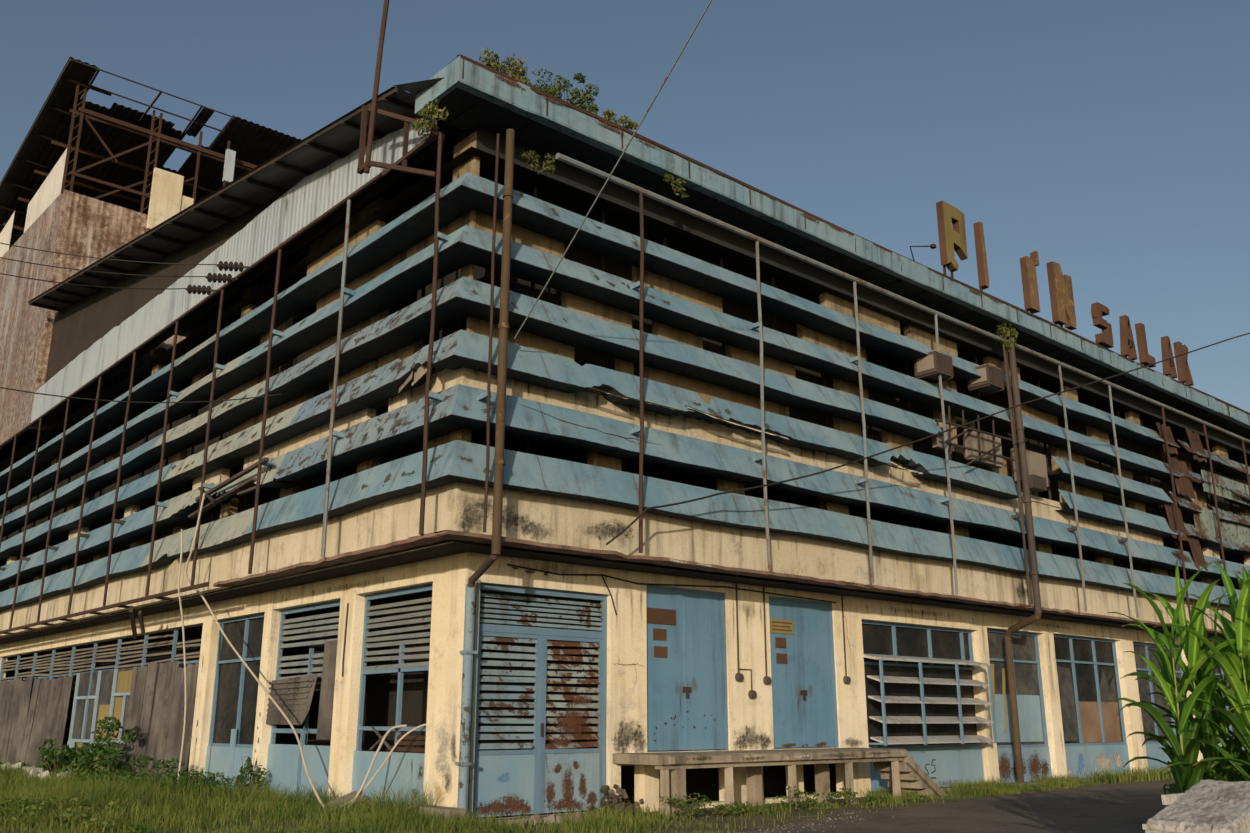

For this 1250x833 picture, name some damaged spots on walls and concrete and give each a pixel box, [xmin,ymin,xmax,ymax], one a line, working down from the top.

peeling [685,401,787,438]
rust [1156,438,1201,482]
damp [462,501,548,541]
damp [588,523,631,539]
rust [1154,493,1202,519]
rust [1162,538,1189,577]
rust [550,695,593,747]
damp [617,723,645,753]
damp [737,727,770,748]
rust [477,796,531,816]
rust [545,761,598,814]